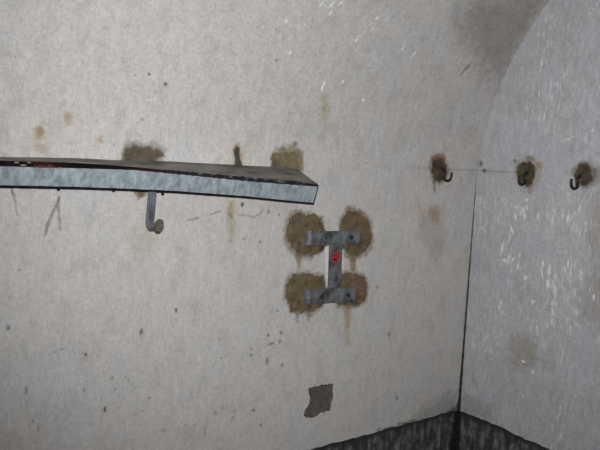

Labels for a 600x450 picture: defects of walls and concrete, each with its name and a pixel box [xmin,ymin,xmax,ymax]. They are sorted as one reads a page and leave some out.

spalling [304,383,333,418]